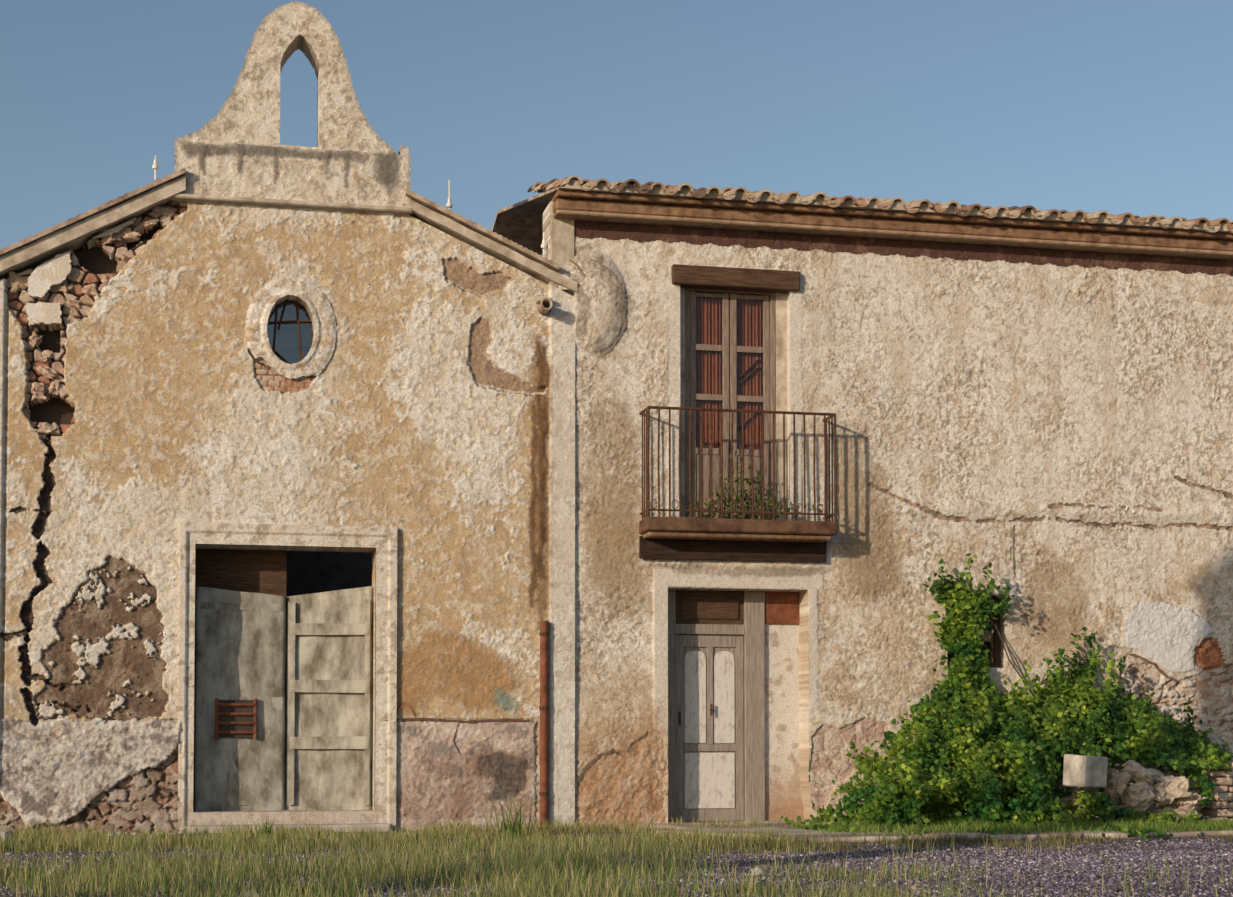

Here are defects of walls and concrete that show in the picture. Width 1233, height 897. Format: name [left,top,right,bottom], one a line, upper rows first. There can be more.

flaking render [443,257,513,297]
flaking render [468,317,548,396]
crack [0,201,187,726]
water stain [529,336,551,621]
crack [869,475,1233,578]
flaking render [0,745,178,834]
flaking render [34,556,169,722]
flaking render [1119,638,1233,792]